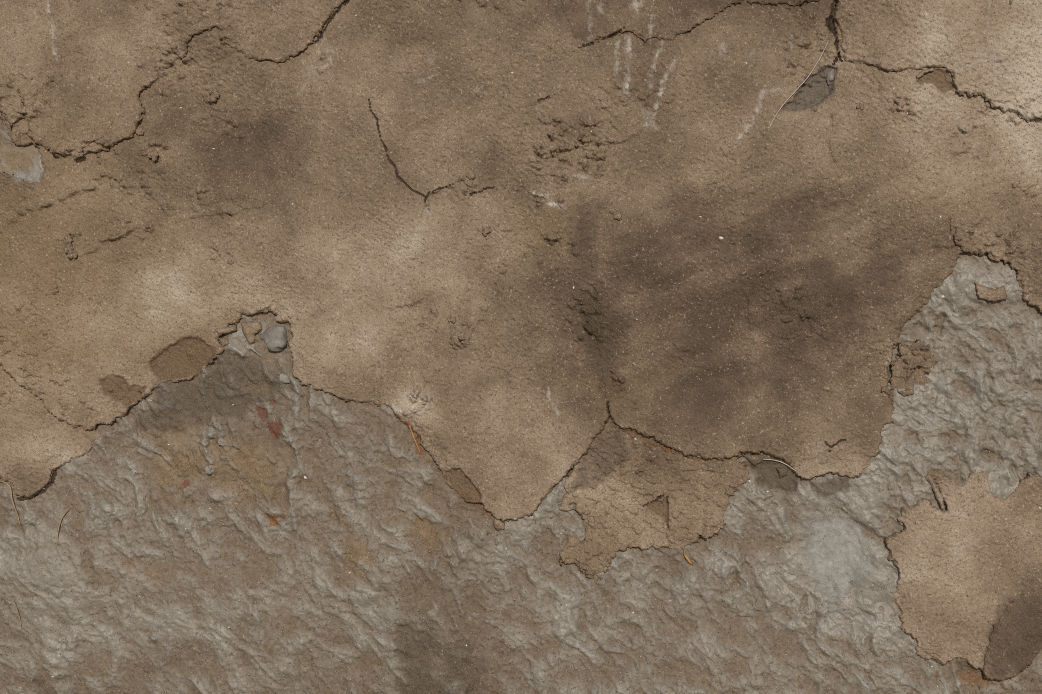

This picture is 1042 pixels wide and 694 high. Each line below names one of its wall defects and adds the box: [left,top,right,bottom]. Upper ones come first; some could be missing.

crack [582,27,625,46]
crack [825,0,843,65]
crack [368,98,495,211]
spalling [149,336,216,379]
spalling [100,375,152,405]